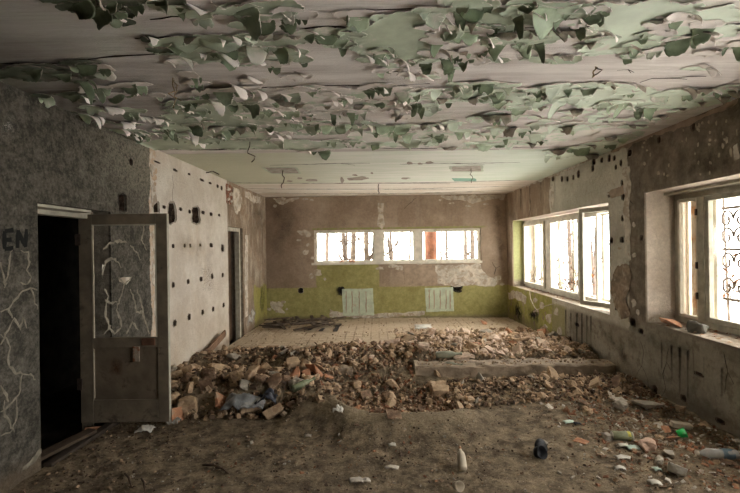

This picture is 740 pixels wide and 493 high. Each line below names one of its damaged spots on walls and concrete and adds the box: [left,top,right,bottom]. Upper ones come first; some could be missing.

peeling [0,0,740,334]
spalling [171,290,624,422]